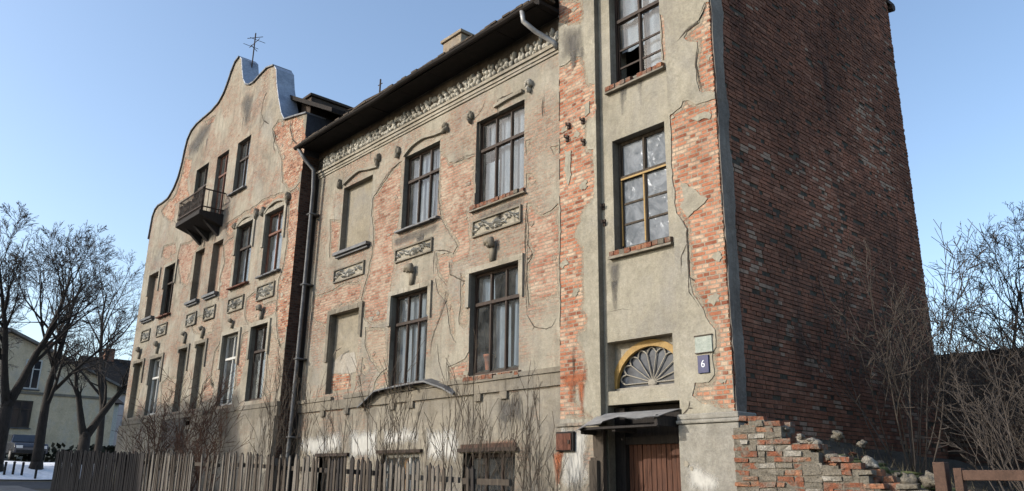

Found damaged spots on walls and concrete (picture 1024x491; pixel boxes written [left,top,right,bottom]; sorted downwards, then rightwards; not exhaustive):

flaking render [559,0,584,26]
crack [679,2,706,91]
flaking render [161,157,192,223]
flaking render [218,116,305,396]
flaking render [311,161,402,391]
crack [430,250,465,380]
flaking render [436,151,476,342]
flaking render [448,353,469,381]
crack [524,211,556,330]
flaking render [526,57,596,490]
crack [680,221,699,306]
flaking render [670,2,735,411]